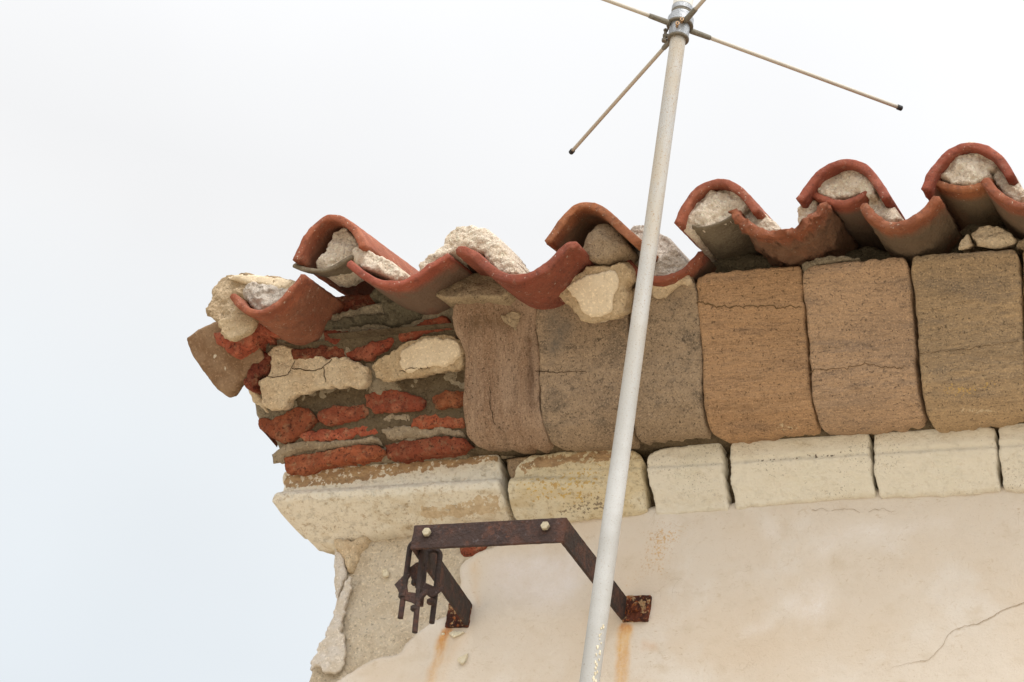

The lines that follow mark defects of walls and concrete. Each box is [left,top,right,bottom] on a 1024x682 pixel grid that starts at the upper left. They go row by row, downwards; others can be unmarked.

crack [696,301,800,309]
crack [268,359,332,382]
crack [810,341,1016,373]
flaking render [440,548,472,586]
flaking render [309,535,449,682]
corrosion [420,553,485,682]
corrosion [608,621,638,682]
crack [891,602,1024,669]